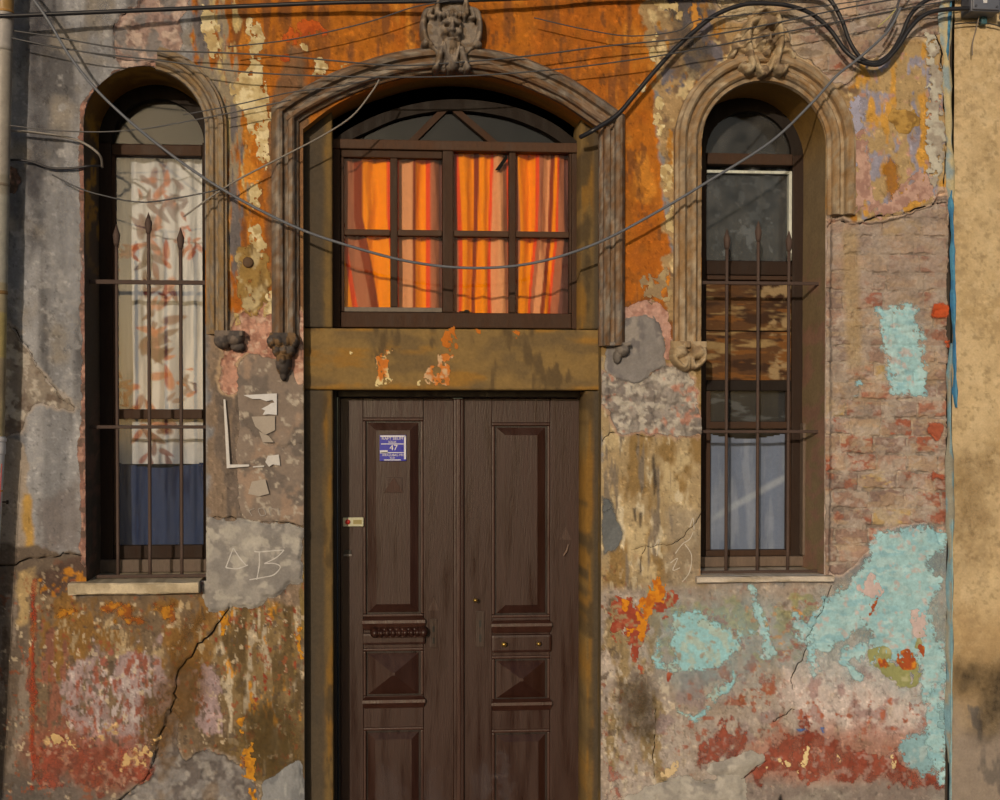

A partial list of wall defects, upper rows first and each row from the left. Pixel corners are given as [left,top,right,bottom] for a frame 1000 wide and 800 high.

peeling [228,17,272,170]
crack [934,33,943,69]
crack [830,143,947,224]
spalling [5,0,189,567]
spalling [219,224,276,395]
spalling [601,267,702,437]
spalling [717,0,949,789]
crack [0,552,81,566]
spalling [26,579,259,800]
crack [119,608,229,800]
peeling [608,576,777,682]
crack [773,585,832,722]